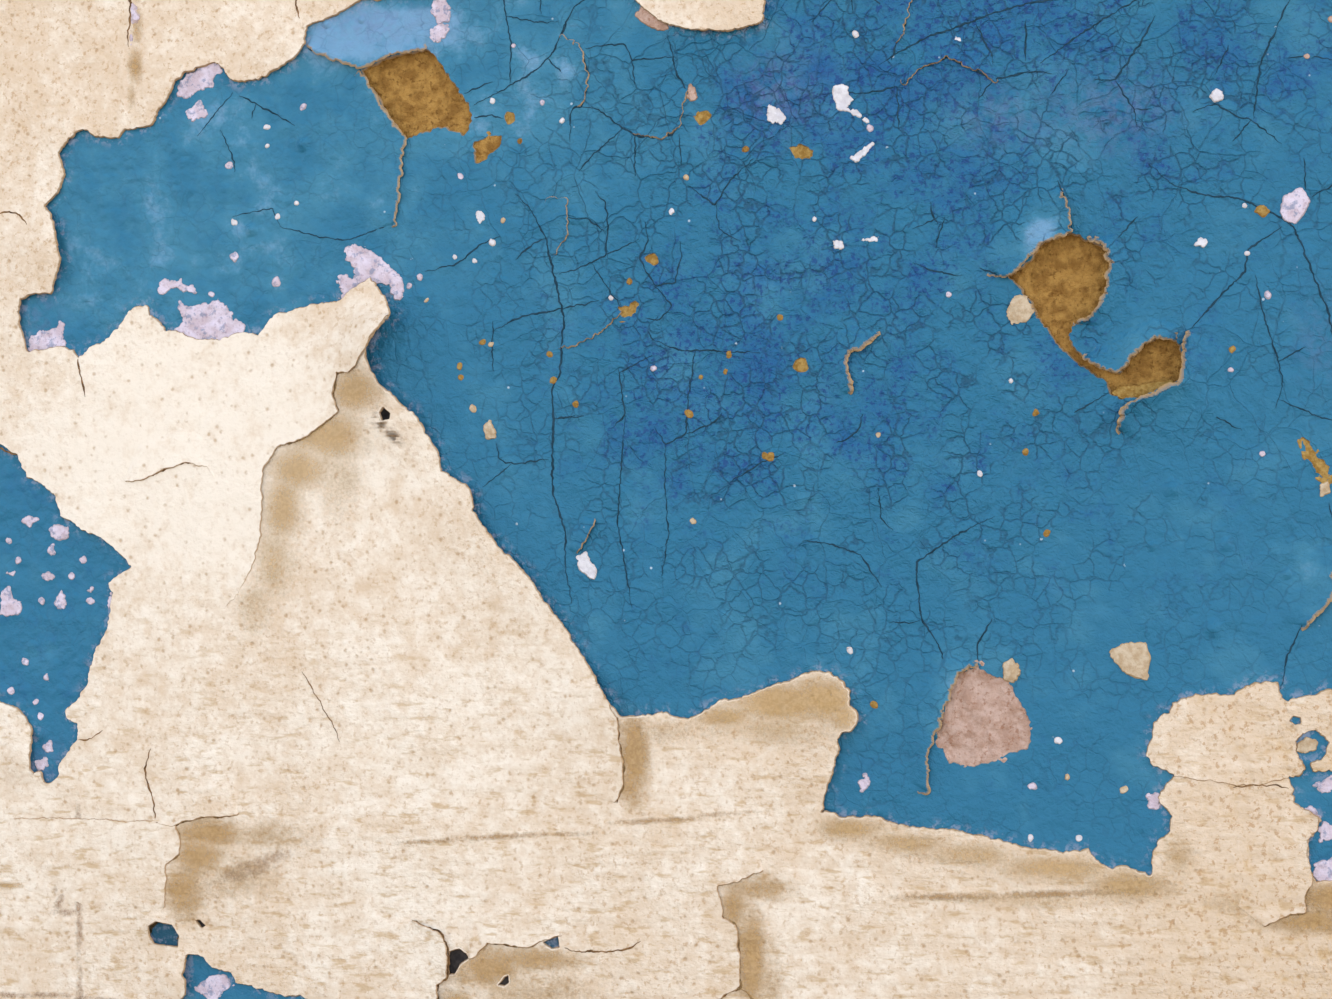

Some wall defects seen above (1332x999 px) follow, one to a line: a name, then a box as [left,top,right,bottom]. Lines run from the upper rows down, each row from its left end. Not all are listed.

spalling [318,51,472,232]
crack [849,0,1155,129]
crack [1193,0,1332,197]
crack [427,0,759,606]
spalling [979,176,1228,452]
crack [1149,165,1332,420]
peeling [0,445,131,783]
crack [144,749,156,817]
spalling [906,653,1032,795]
peeling [1237,730,1332,927]
peeling [183,911,450,999]
crack [566,941,641,953]